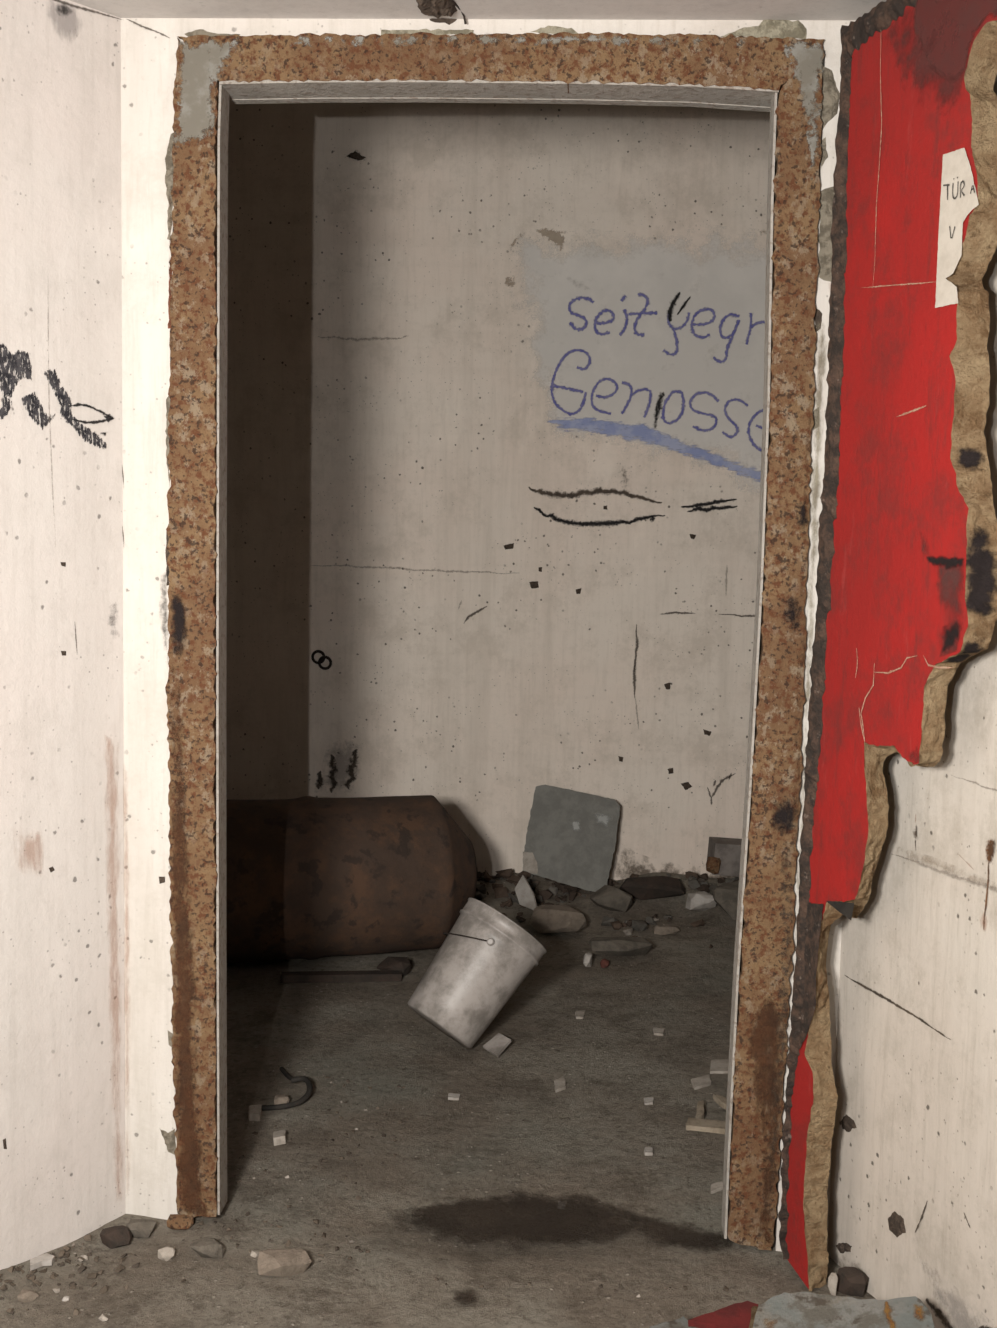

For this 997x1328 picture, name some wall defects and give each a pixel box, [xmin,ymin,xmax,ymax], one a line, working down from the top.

flaking render [820,65,840,167]
flaking render [817,186,835,282]
flaking render [814,308,822,332]
corrosion [983,840,995,929]
spalling [841,1114,857,1132]
leakage [394,1193,732,1249]
spalling [888,1202,927,1237]
spalling [836,1243,852,1267]